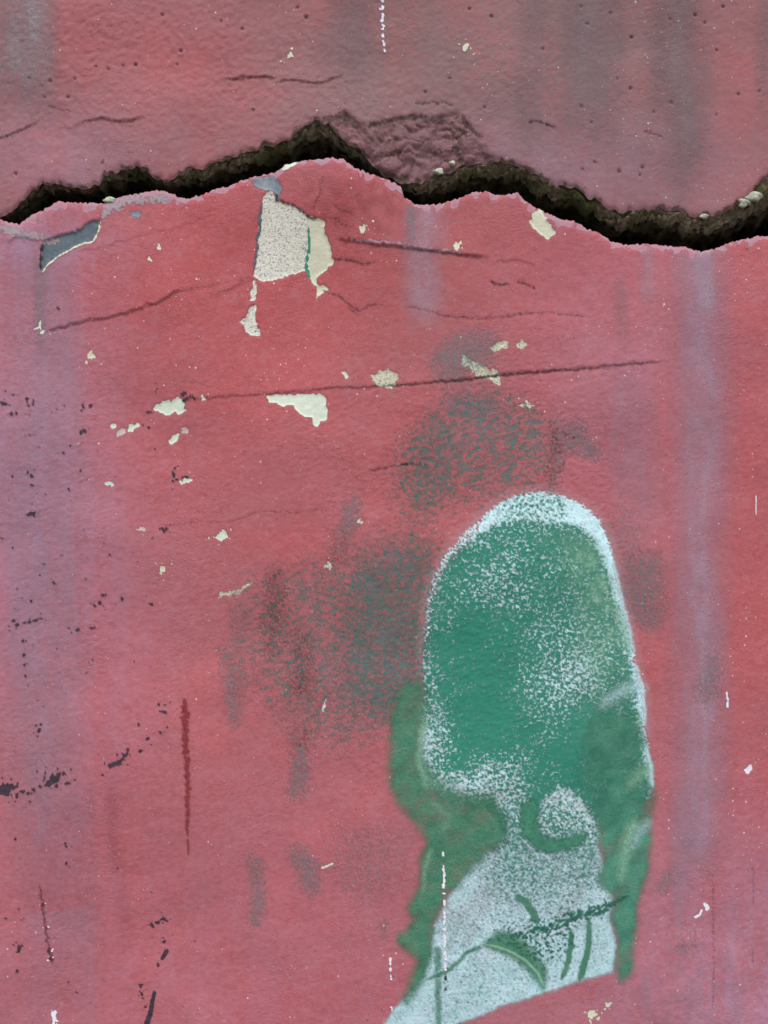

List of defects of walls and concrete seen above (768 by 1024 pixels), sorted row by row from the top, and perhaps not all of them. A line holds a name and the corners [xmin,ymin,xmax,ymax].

crack [0,120,768,264]
peeling [529,209,556,240]
peeling [39,220,101,272]
peeling [239,176,334,336]
peeling [371,368,399,389]
crack [392,362,643,386]
peeling [153,397,186,416]
peeling [266,393,328,427]